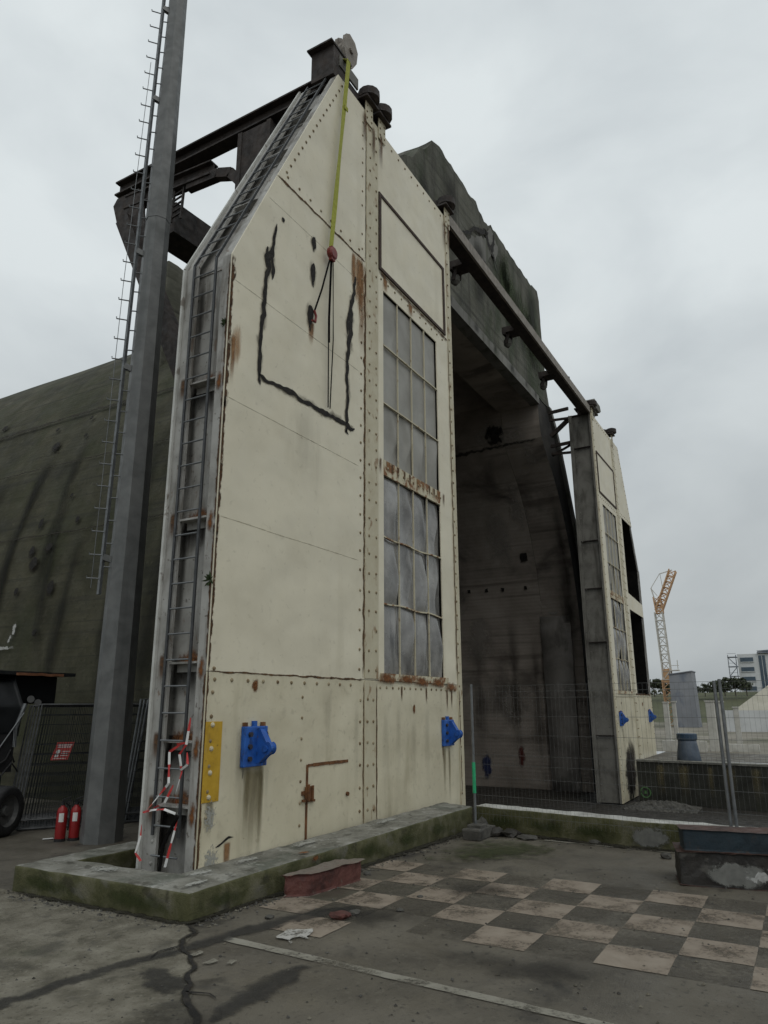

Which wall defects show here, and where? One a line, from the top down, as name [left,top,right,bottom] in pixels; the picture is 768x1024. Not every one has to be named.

corrosion [364,113,383,157]
corrosion [170,177,463,870]
damp [245,771,263,800]
damp [626,744,637,801]
spalling [709,863,768,889]